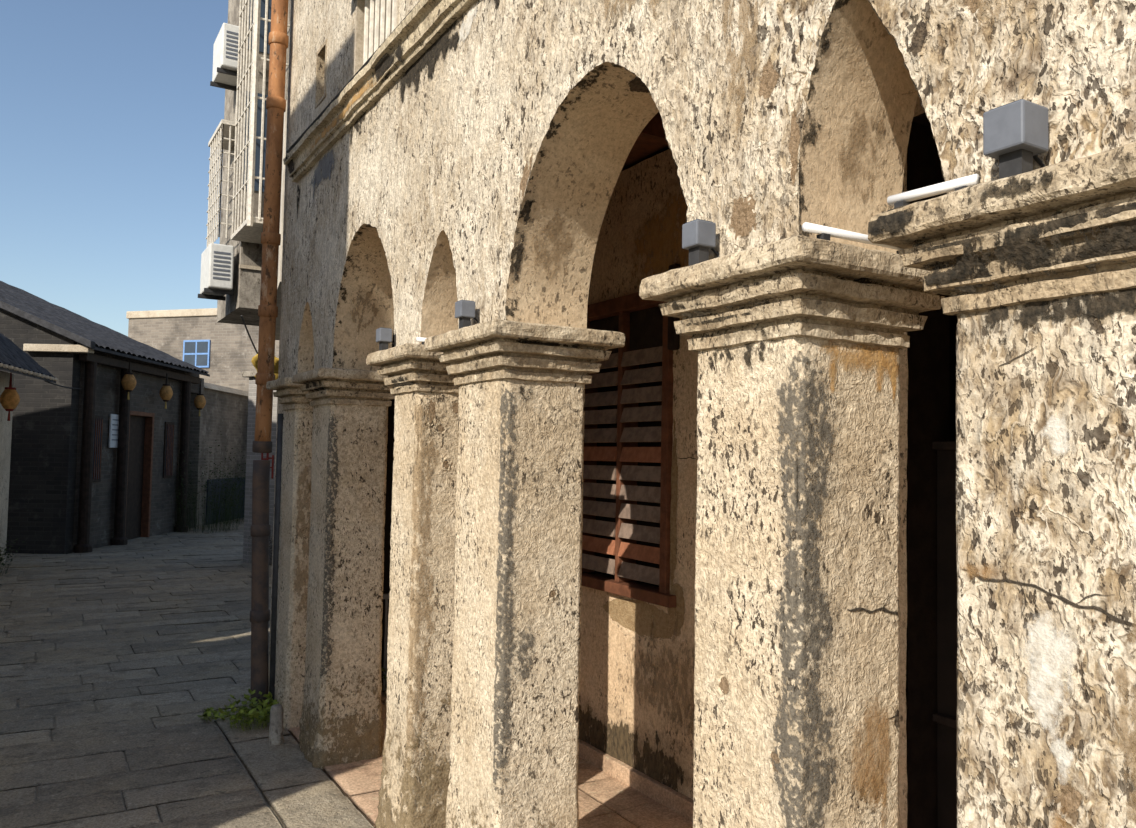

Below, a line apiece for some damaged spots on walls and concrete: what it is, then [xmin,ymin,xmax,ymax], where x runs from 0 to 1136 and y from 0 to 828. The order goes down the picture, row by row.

crack [847,594,900,622]
crack [962,569,1136,626]
water stain [578,617,695,792]